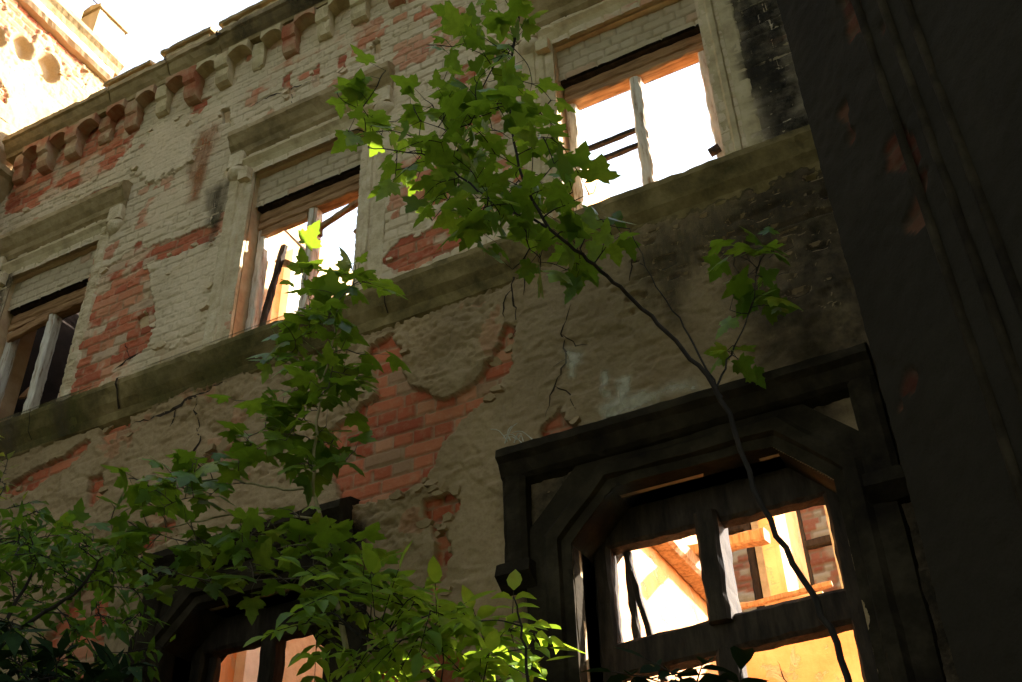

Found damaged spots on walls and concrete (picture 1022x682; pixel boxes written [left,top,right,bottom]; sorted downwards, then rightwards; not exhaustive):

leakage [740,8,768,89]
flaking render [70,226,220,393]
crack [545,304,586,417]
flaking render [2,419,133,499]
flaking render [324,324,516,596]